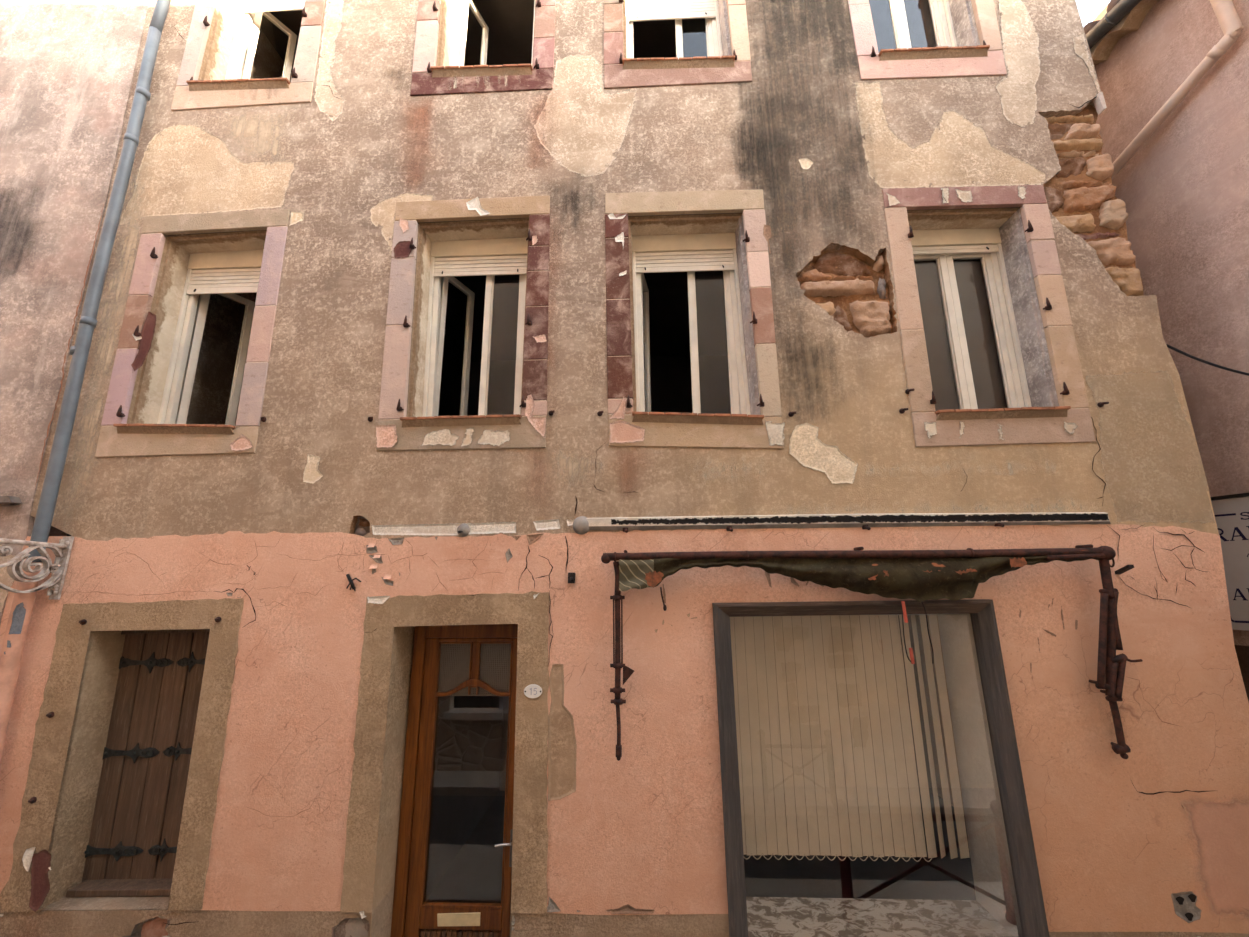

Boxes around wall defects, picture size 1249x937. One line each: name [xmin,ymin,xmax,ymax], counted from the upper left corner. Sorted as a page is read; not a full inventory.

peeling [534,54,638,177]
leakage [741,0,862,266]
peeling [854,0,1144,296]
flaking render [797,248,893,338]
peeling [766,421,858,484]
crack [71,447,638,666]
crack [1091,417,1205,608]
crack [1131,781,1209,809]
peeling [22,847,51,912]
flaking render [122,917,171,937]
flaking render [333,911,370,937]